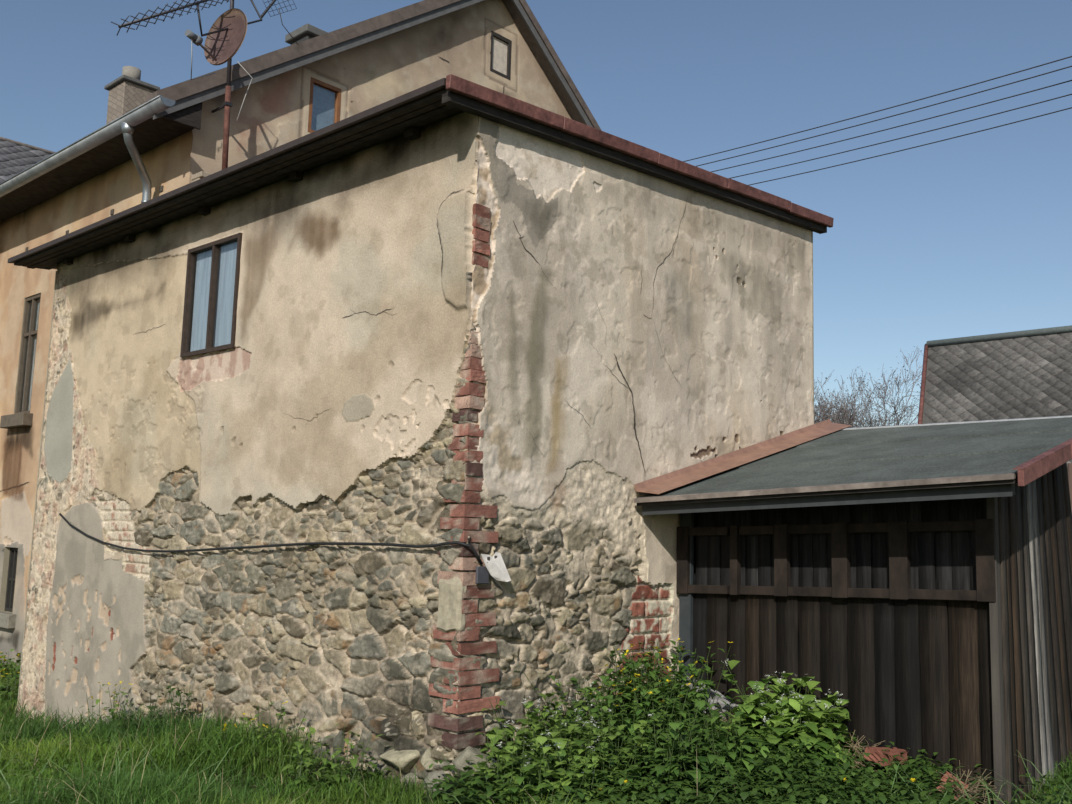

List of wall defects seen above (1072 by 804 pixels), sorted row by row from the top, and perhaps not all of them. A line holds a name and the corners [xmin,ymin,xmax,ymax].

spalling [18,125,674,798]
damp [528,309,540,449]
crack [593,302,646,476]